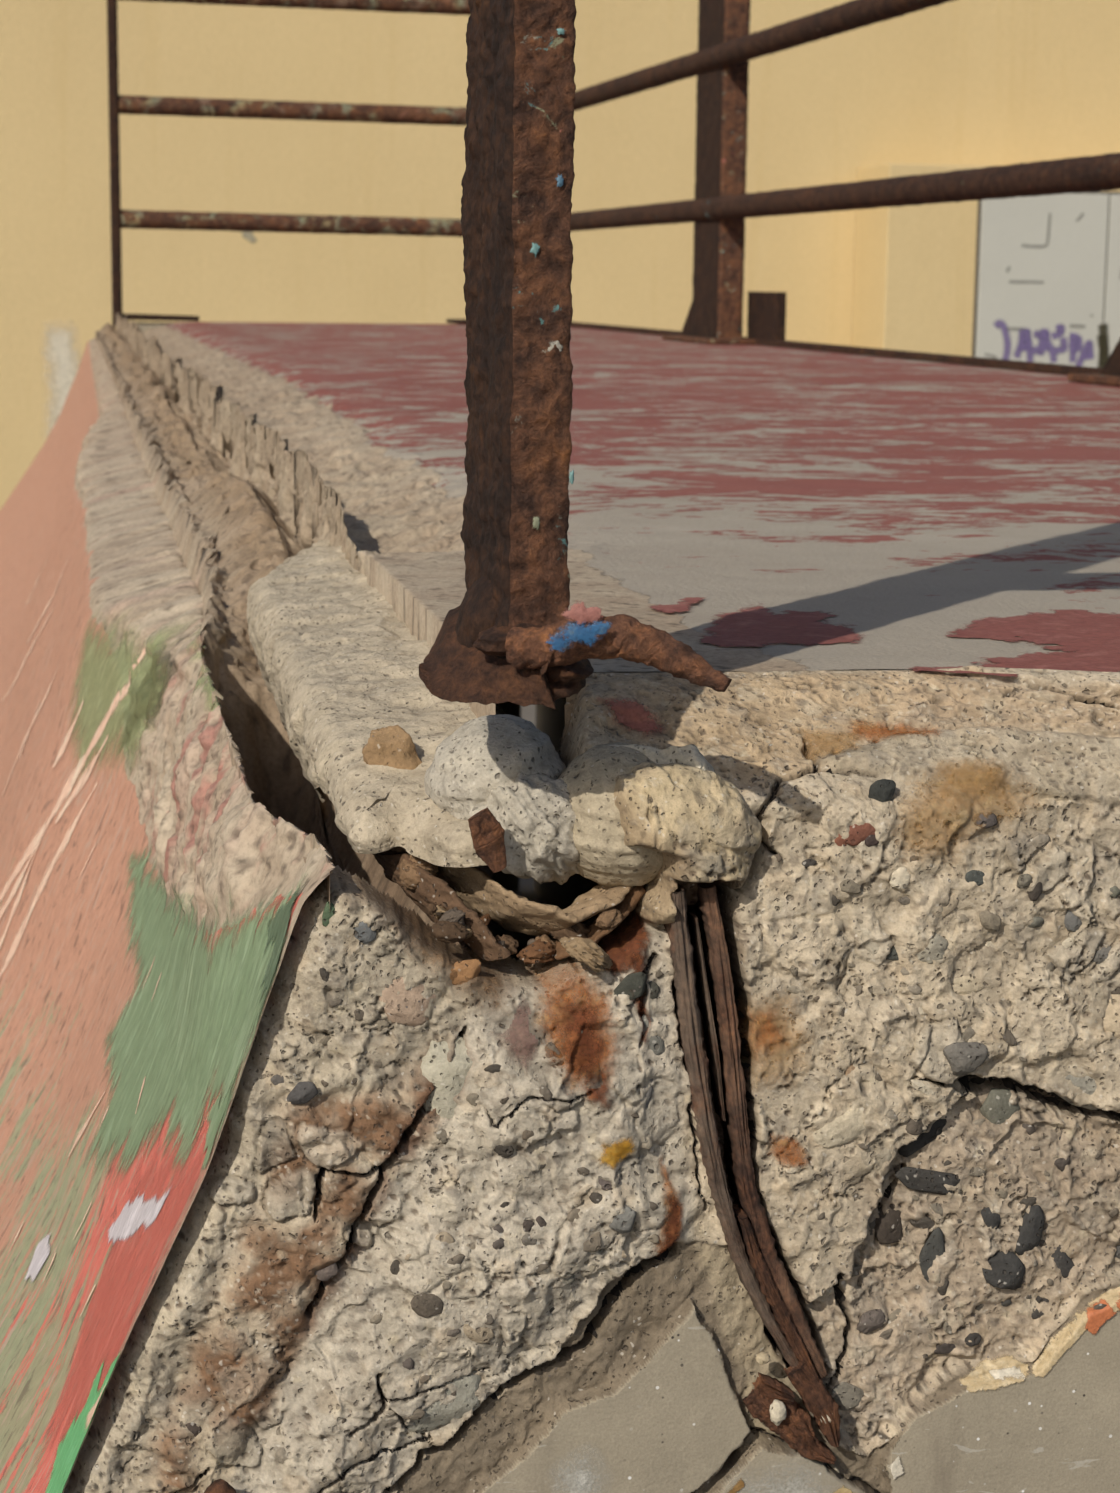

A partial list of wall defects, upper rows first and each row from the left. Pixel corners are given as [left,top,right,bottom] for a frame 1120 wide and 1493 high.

spalling [45,313,1120,1493]
rust [505,977,611,1107]
crack [920,1074,1120,1118]
rust [773,1138,807,1164]
rust [660,1167,682,1253]
peeling [25,1235,50,1282]
rust [742,1362,840,1464]